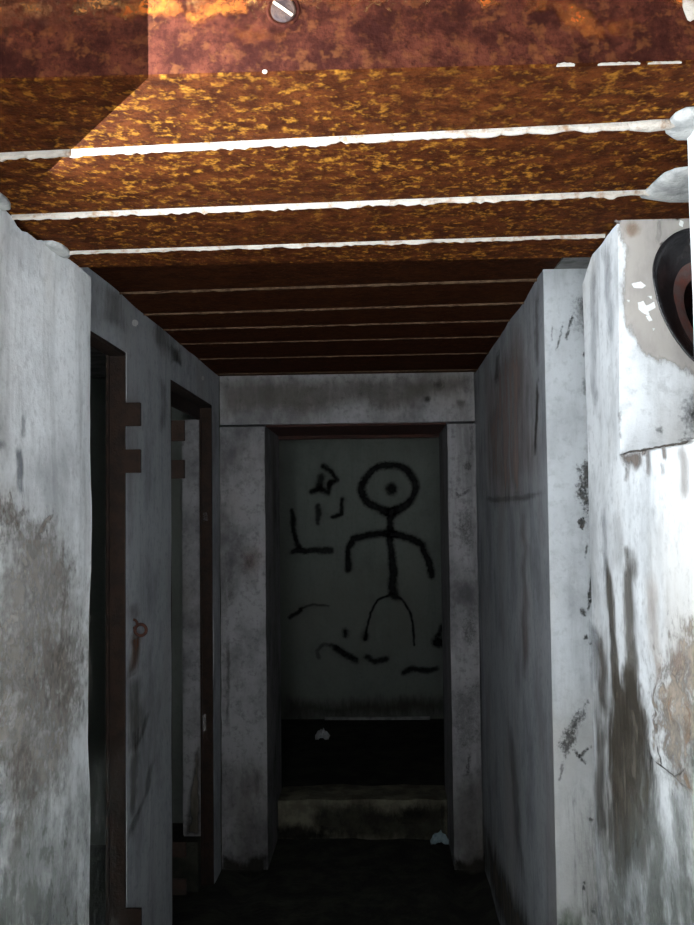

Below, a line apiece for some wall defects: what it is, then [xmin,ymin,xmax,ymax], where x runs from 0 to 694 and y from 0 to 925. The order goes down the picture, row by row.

rust [66,0,267,23]
rust [557,4,597,37]
peeling [627,281,656,331]
water stain [576,461,589,530]
water stain [560,550,694,925]